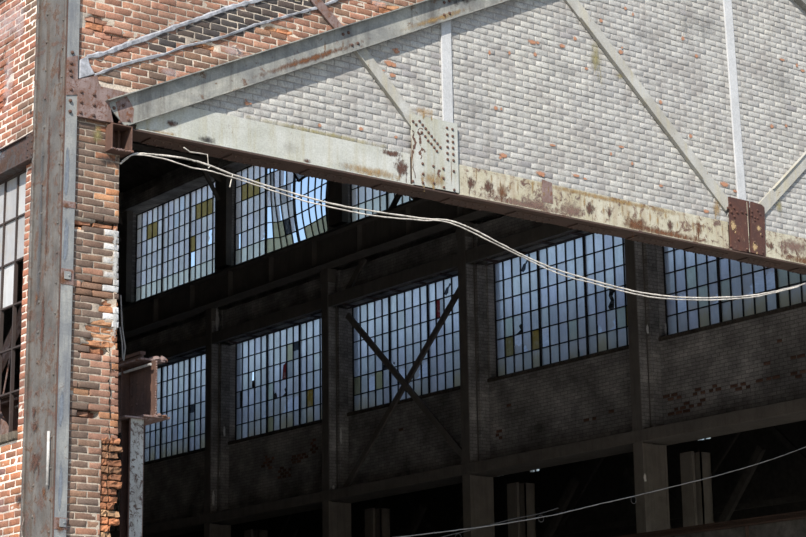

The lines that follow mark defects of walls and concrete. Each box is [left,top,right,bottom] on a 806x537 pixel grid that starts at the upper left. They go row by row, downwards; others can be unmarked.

spalling [0,69,10,113]
rust [356,128,452,189]
rust [468,172,706,242]
peeling [74,220,118,285]
rust [770,239,806,264]
spalling [80,299,118,355]
spalling [99,437,123,537]